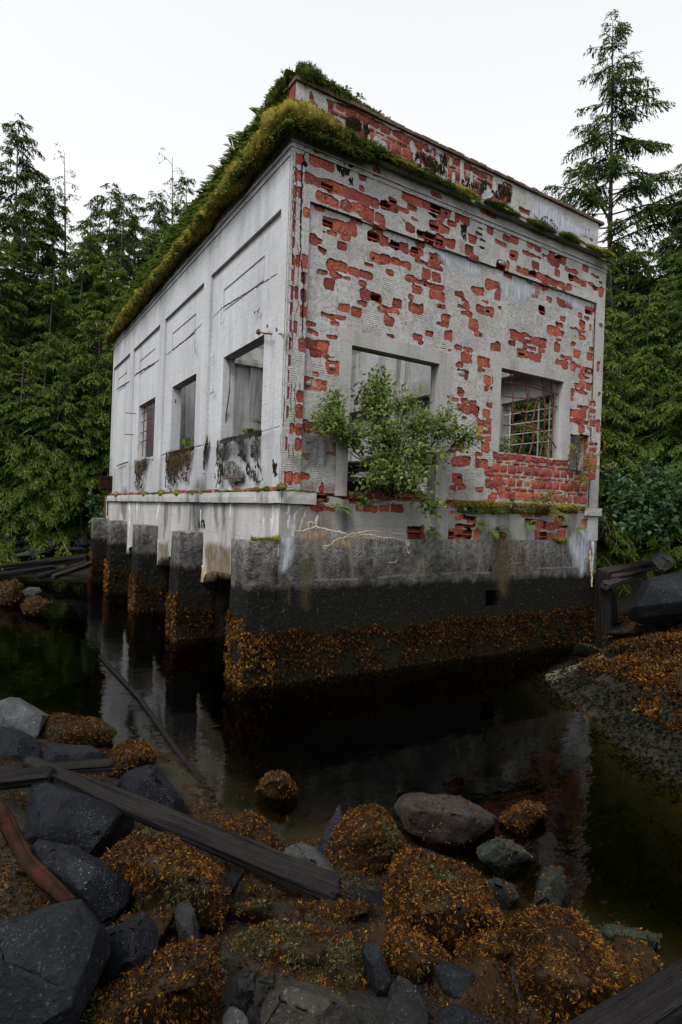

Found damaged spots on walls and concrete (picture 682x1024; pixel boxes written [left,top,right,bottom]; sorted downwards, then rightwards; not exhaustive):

crack [116,143,308,390]
spalling [266,91,604,540]
leakage [263,503,295,571]
leakage [560,527,594,587]